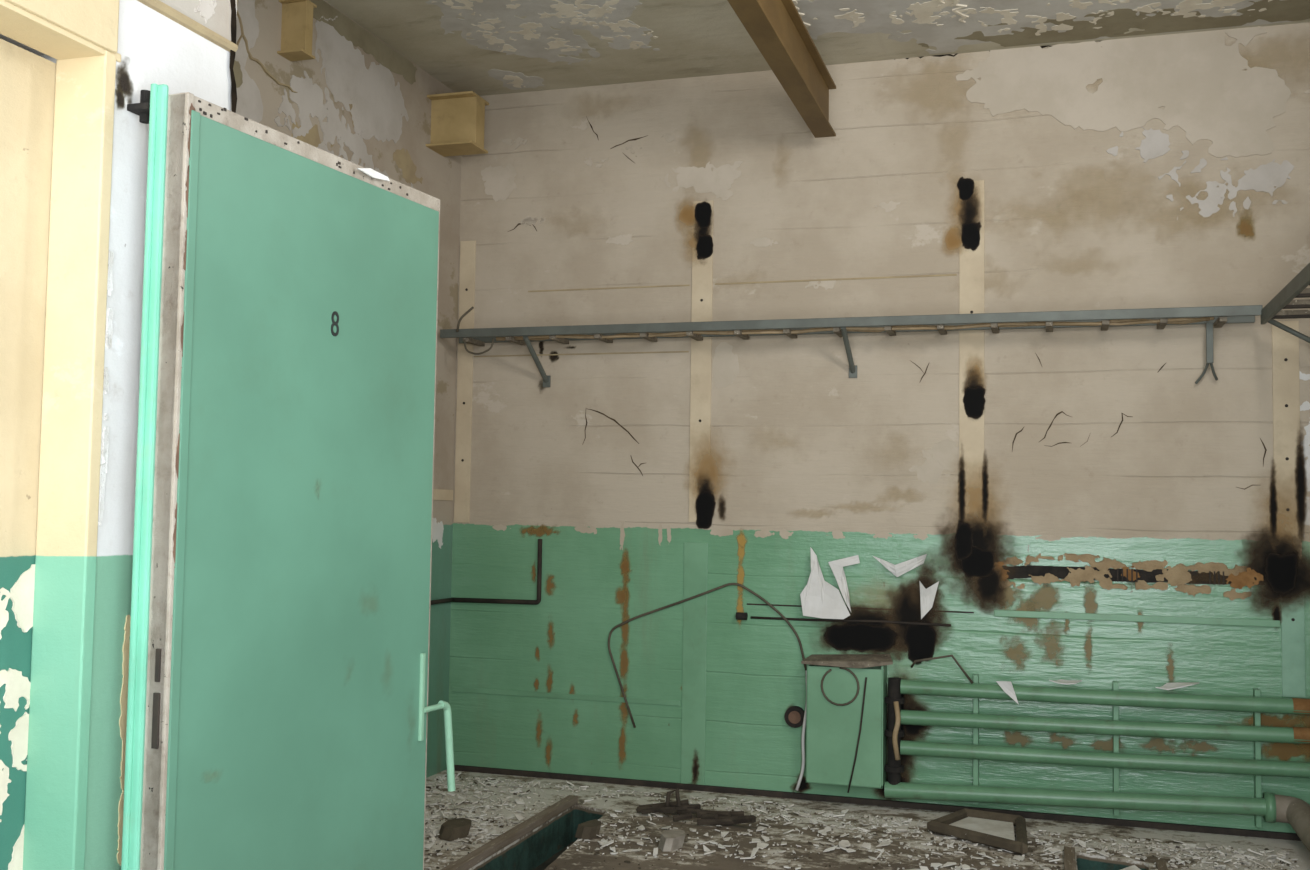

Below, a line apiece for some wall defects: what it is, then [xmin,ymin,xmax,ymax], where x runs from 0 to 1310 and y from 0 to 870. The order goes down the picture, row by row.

peeling [195,0,217,23]
peeling [425,0,660,65]
peeling [796,0,1310,221]
peeling [1300,401,1310,537]
peeling [0,564,36,639]
peeling [1002,553,1252,601]
rust [534,623,555,693]
rust [616,552,630,763]
peeling [0,668,30,822]
rust [536,721,552,766]
peeling [8,825,25,870]